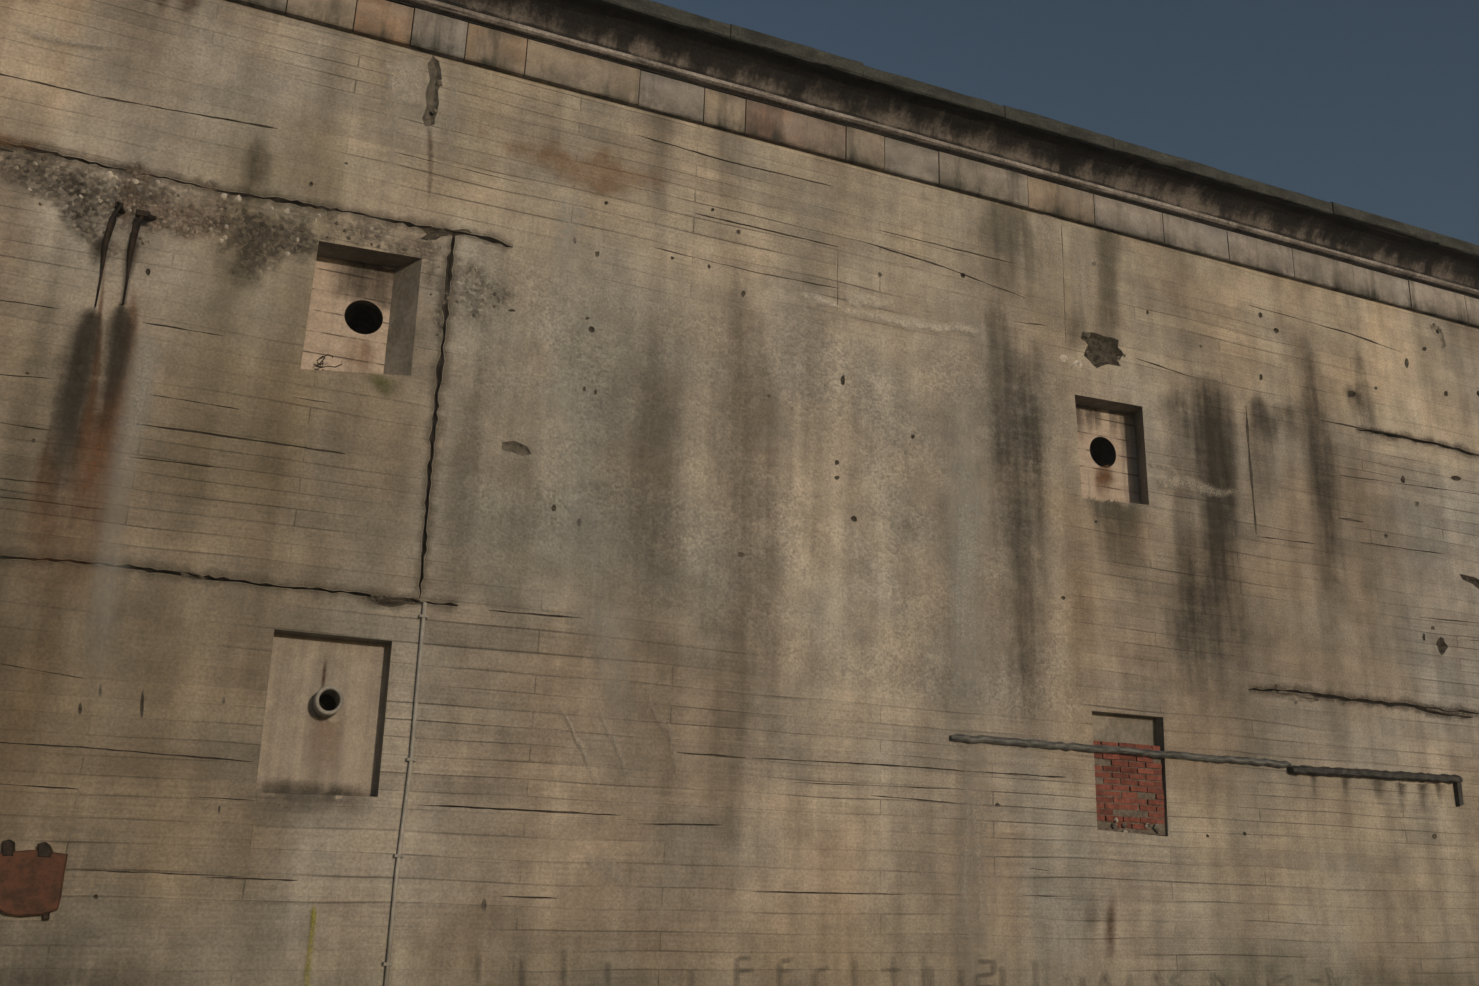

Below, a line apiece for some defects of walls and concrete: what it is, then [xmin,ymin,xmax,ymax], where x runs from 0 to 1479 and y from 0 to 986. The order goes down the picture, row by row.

spalling [1,151,472,274]
rust [75,300,135,493]
crack [0,138,513,606]
spalling [1060,331,1126,369]
crack [1356,429,1479,456]
leakage [1196,388,1235,628]
crack [1248,686,1479,719]